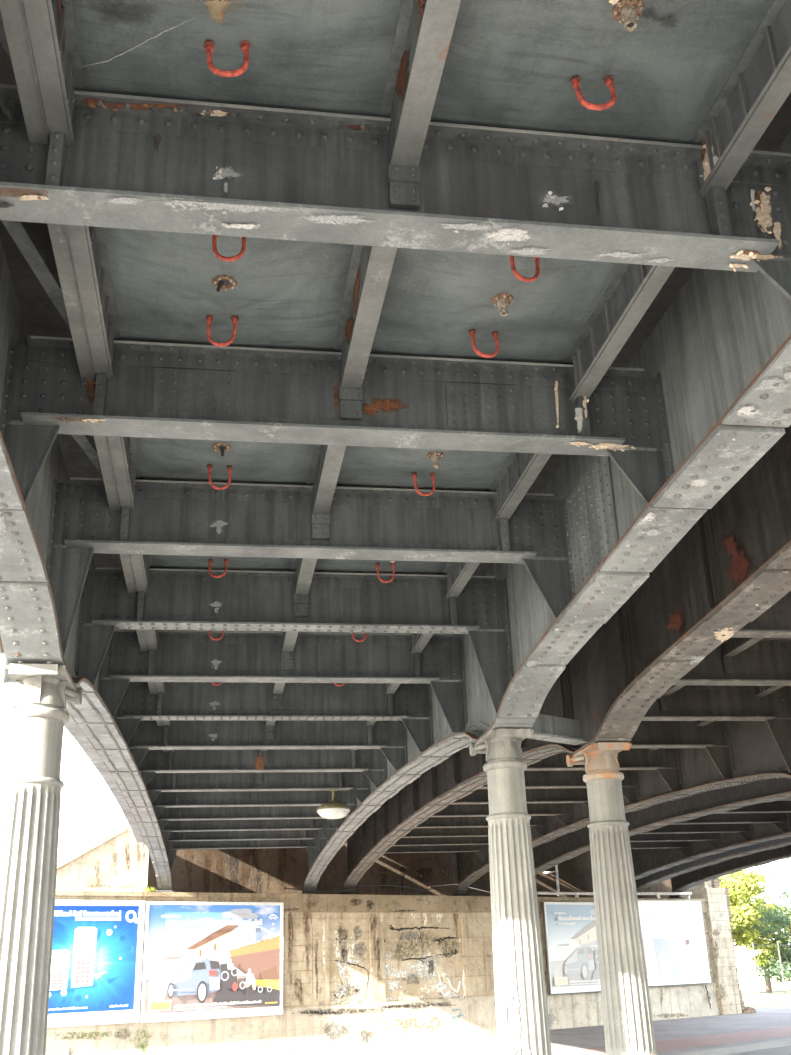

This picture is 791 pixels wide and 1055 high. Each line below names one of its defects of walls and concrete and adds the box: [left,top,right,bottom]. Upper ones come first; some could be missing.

corrosion [206,0,229,23]
corrosion [81,98,187,112]
peeling [728,187,783,272]
corrosion [362,398,406,415]
peeling [571,396,636,452]
leakage [410,912,458,935]
leakage [288,913,325,997]
leakage [330,915,380,1005]
crack [389,925,458,963]